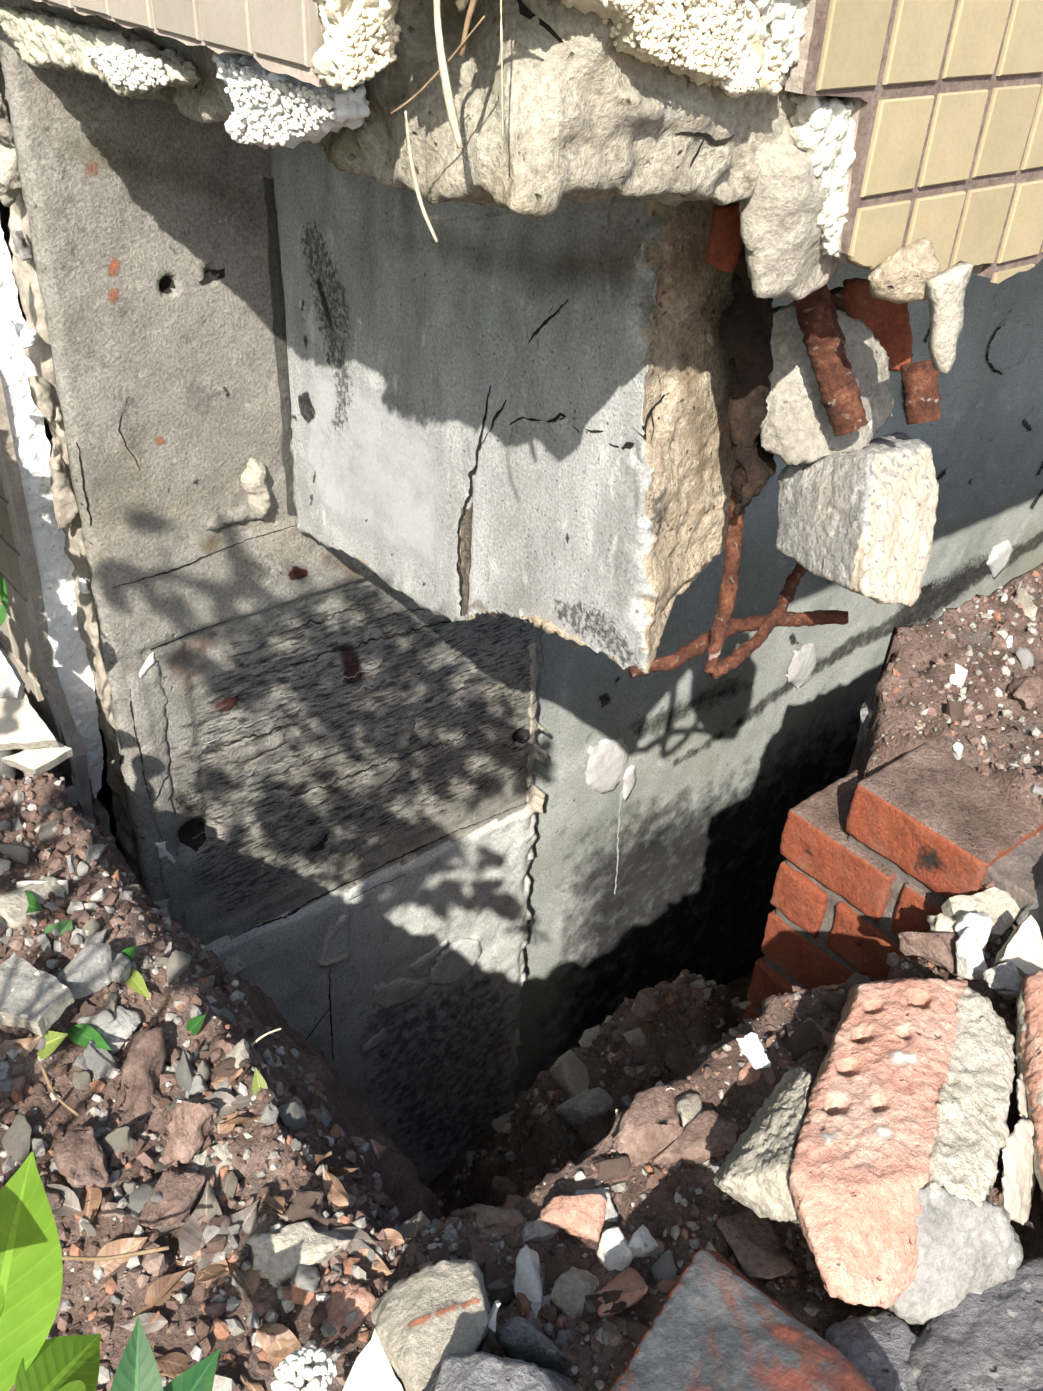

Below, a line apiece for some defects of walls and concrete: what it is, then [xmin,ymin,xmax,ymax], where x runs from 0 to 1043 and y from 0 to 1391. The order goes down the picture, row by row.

peeling [291,392,315,423]
peeling [301,222,353,429]
crack [528,299,568,344]
rust [794,284,868,436]
rust [900,359,941,425]
spalling [139,652,156,678]
peeling [155,586,549,911]
crack [456,386,665,616]
leakage [674,682,793,765]
rust [628,461,849,679]
leakage [811,555,992,675]
leakage [1008,531,1043,565]